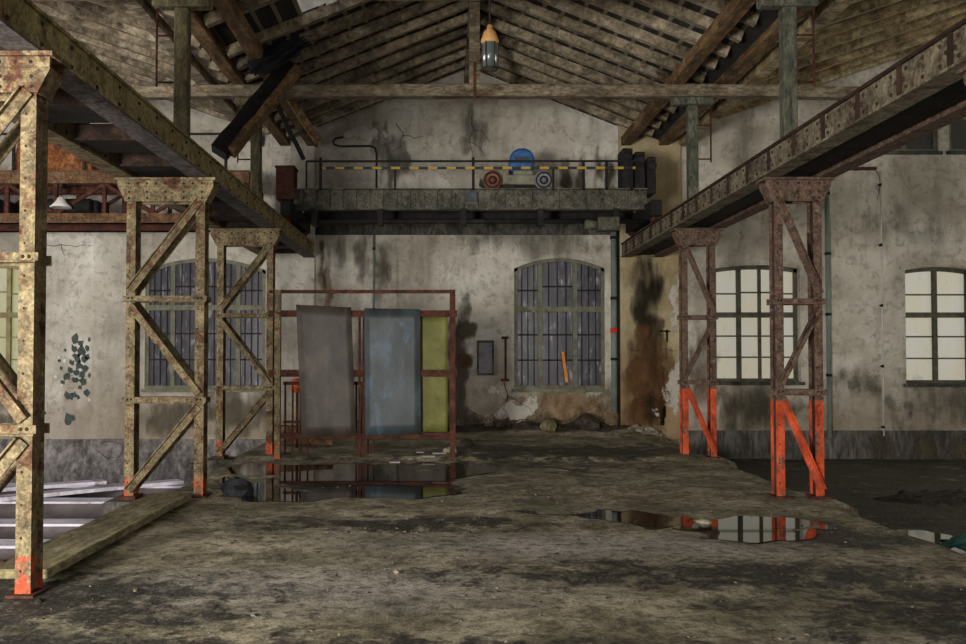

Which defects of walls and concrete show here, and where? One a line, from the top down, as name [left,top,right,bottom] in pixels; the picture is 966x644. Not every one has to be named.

water stain [631,260,664,346]
peeling [54,333,91,401]
flaking render [480,385,618,427]